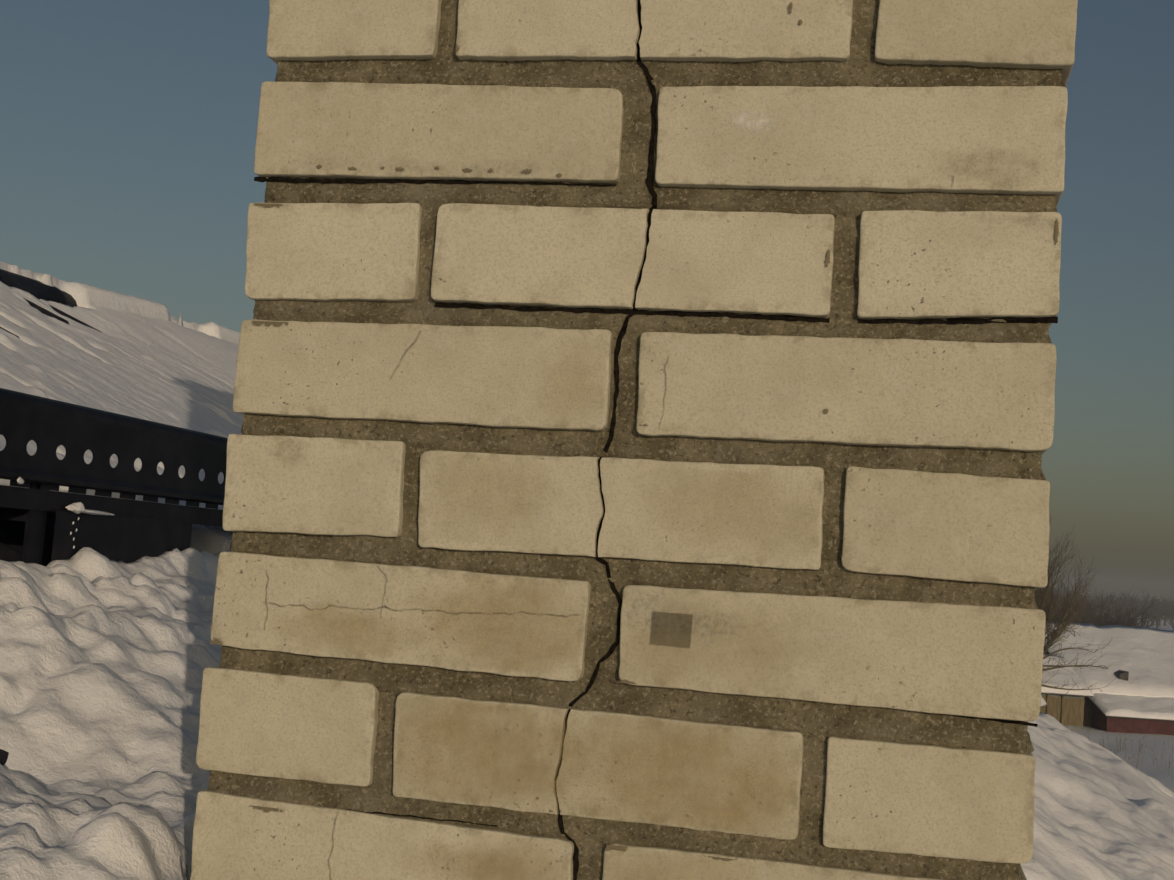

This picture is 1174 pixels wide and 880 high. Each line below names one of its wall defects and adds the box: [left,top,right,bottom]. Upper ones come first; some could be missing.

crack [254,176,616,187]
crack [858,316,1058,324]
crack [435,0,830,880]
crack [953,715,1038,727]
crack [347,809,497,827]